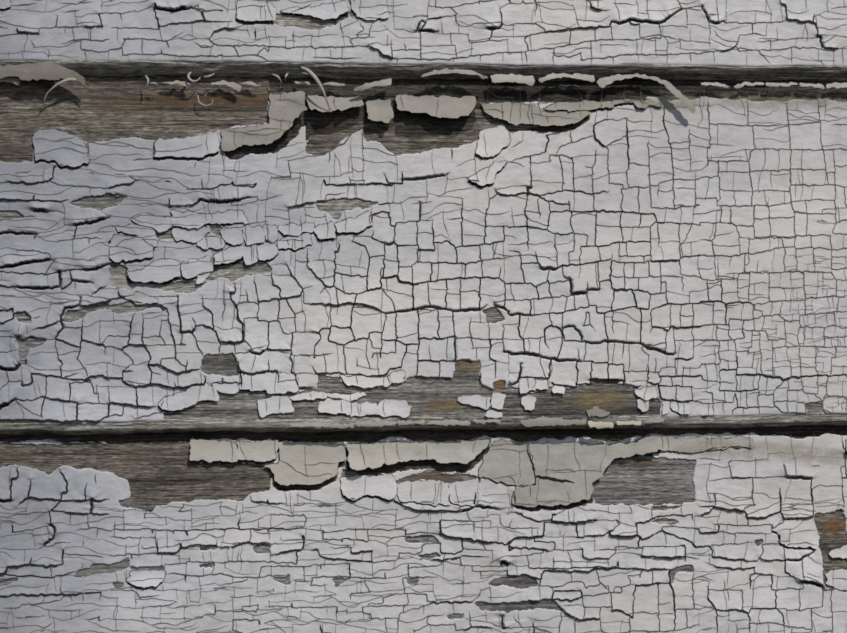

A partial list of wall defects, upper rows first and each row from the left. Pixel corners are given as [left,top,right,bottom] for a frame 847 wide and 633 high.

peeling [236,0,389,30]
crack [0,0,847,65]
peeling [0,76,663,186]
crack [0,83,847,423]
peeling [158,361,691,422]
peeling [0,436,754,512]
crack [0,430,847,633]
peeling [772,509,847,590]